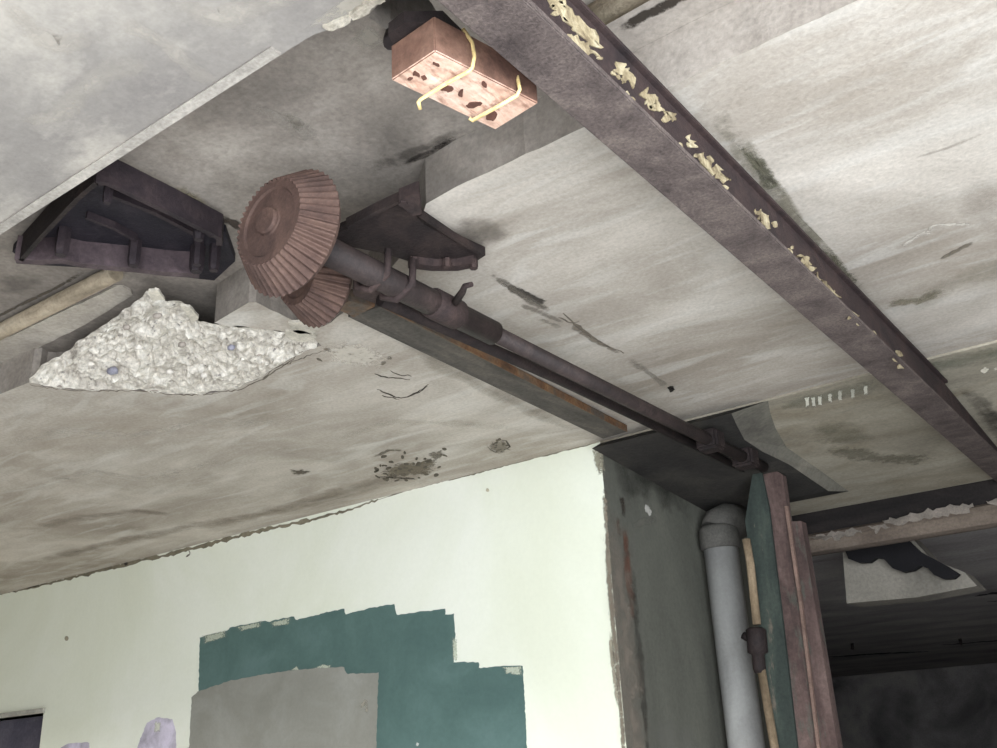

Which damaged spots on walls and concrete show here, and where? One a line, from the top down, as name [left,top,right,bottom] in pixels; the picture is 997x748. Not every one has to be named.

spalling [319,0,385,31]
spalling [29,288,392,395]
crack [558,313,624,353]
peeling [810,503,974,541]